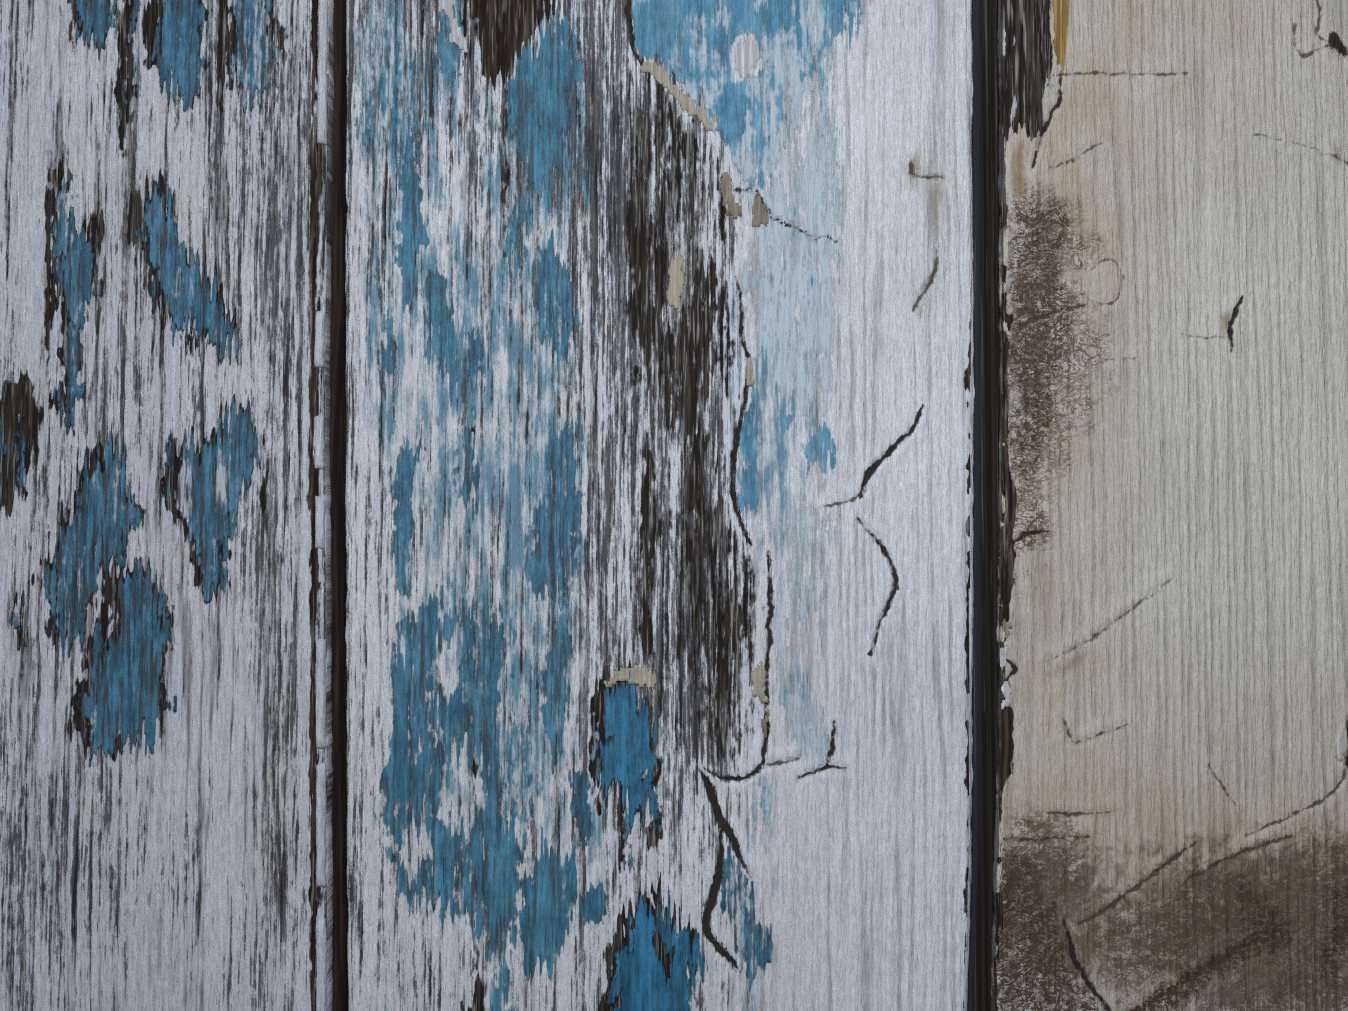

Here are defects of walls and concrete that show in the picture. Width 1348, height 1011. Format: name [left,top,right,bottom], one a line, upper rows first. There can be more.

peeling [67,0,288,158]
peeling [0,151,105,518]
peeling [9,424,177,767]
peeling [160,392,269,604]
peeling [307,0,323,1011]
peeling [352,0,873,1011]
crack [704,285,774,781]
crack [825,404,924,656]
water stain [1001,197,1105,520]
water stain [993,815,1099,1011]
crack [1079,720,1348,924]
water stain [1093,842,1348,1011]